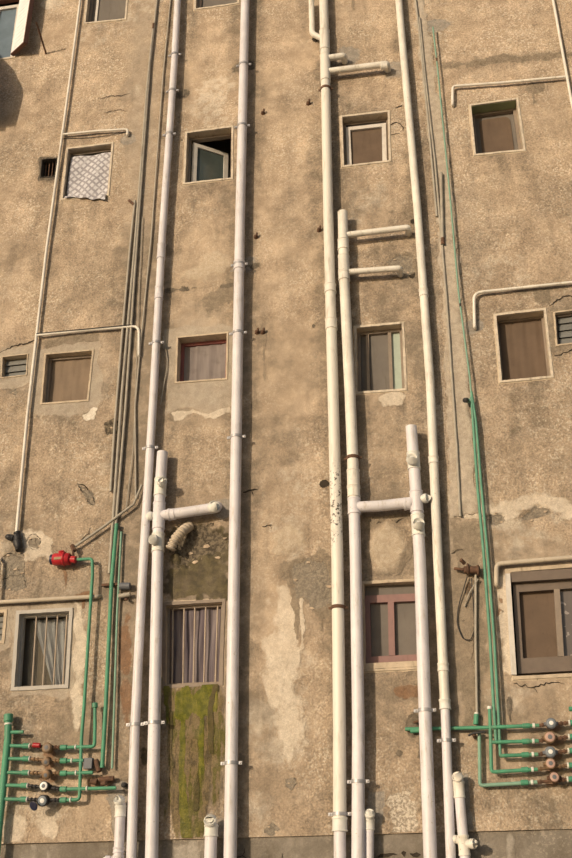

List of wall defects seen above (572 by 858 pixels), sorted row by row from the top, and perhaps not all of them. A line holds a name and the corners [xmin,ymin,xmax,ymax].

flaking render [81,407,122,435]
peeling [171,406,231,422]
flaking render [77,483,95,505]